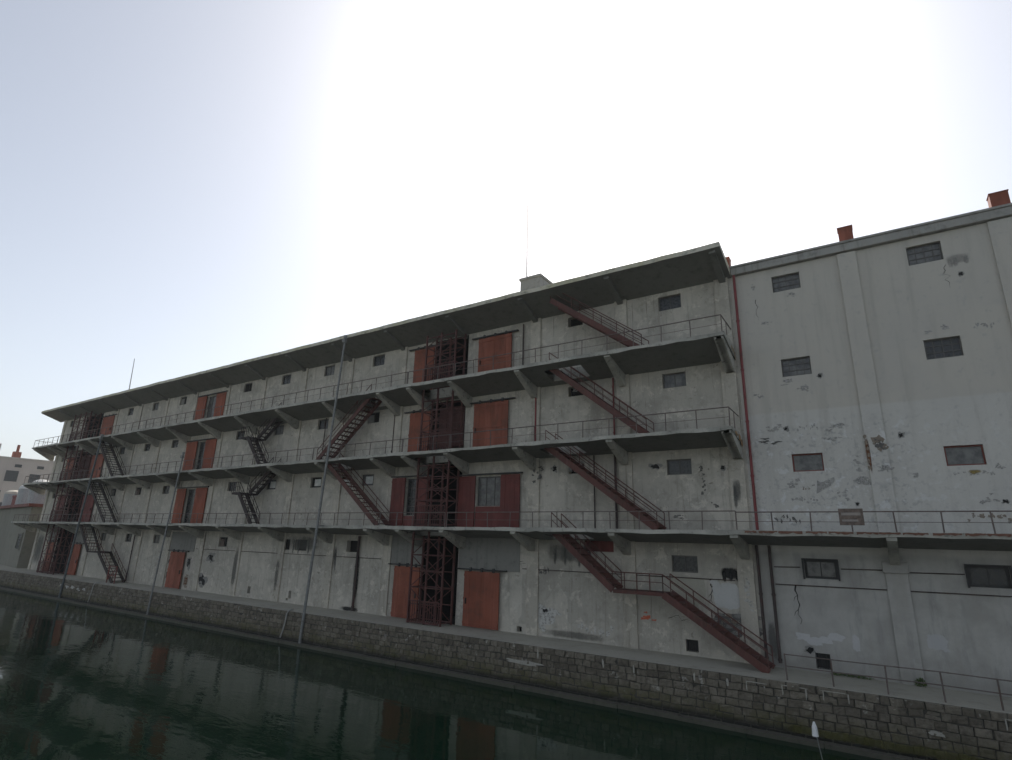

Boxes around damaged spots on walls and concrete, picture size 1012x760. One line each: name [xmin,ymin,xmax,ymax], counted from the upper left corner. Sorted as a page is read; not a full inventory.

peeling [758,423,845,445]
spalling [870,435,889,452]
peeling [787,456,871,506]
peeling [967,493,1012,522]